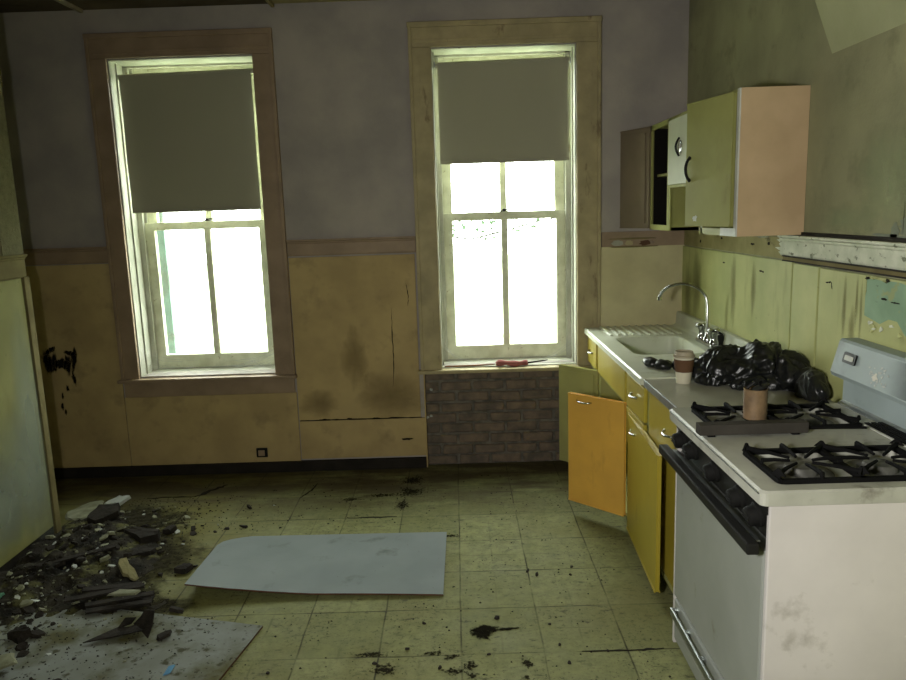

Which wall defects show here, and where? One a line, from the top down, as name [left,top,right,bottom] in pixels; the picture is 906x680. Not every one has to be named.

peeling [864,276,906,338]
leakage [42,346,77,384]